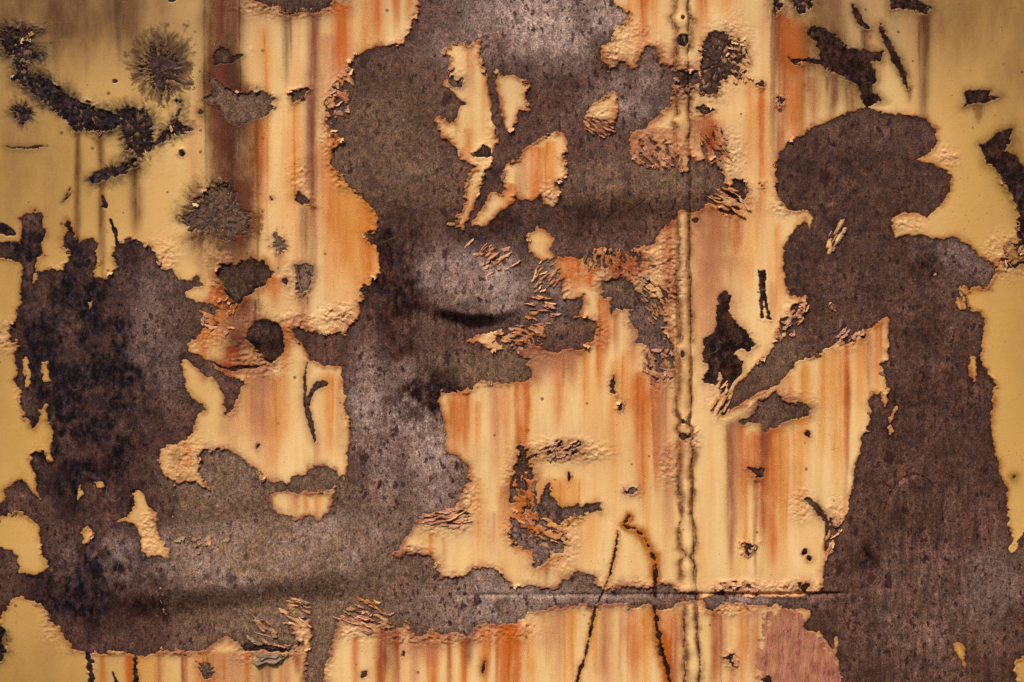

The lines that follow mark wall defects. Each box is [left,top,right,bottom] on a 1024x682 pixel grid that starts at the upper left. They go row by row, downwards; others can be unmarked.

peeling [325,67,352,132]
peeling [464,238,520,277]
peeling [199,297,238,336]
corrosion [0,0,749,682]
peeling [492,261,560,354]
peeling [776,298,809,341]
peeling [836,327,866,344]
corrosion [702,0,1024,682]
peeling [824,511,843,562]
peeling [244,597,312,667]
crack [576,512,674,682]
peeling [756,607,842,682]